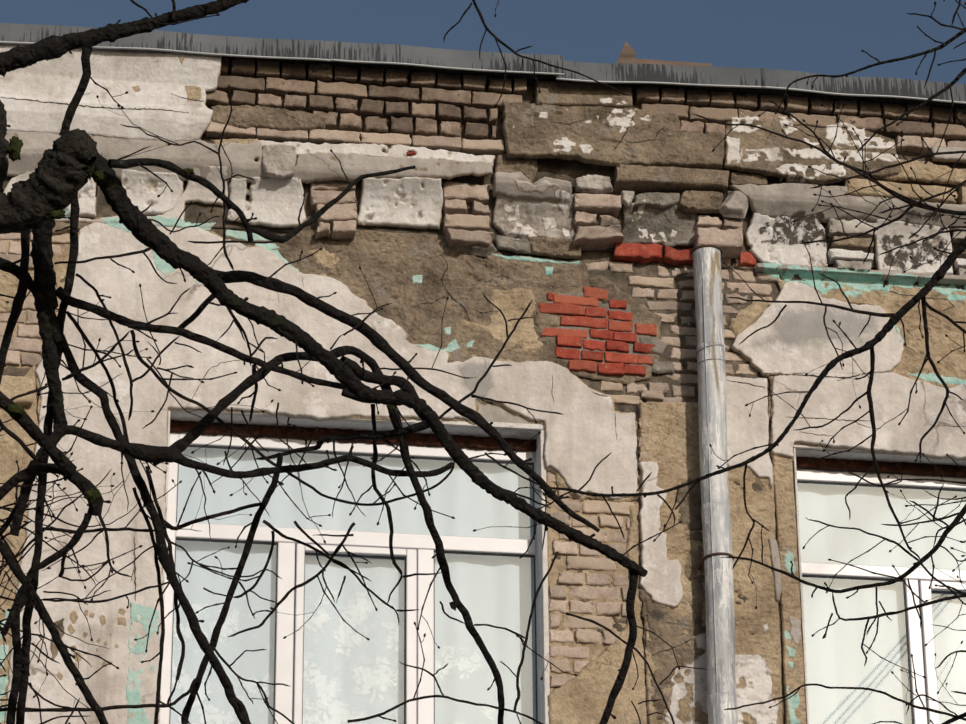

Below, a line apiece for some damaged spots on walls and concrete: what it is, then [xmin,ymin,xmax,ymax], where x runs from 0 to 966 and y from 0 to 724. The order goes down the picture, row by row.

peeling [584,97,651,134]
flaking render [52,209,89,316]
peeling [101,217,131,233]
peeling [153,251,175,274]
peeling [149,215,216,230]
flaking render [0,229,42,425]
flaking render [226,115,966,724]
flaking render [0,408,35,724]